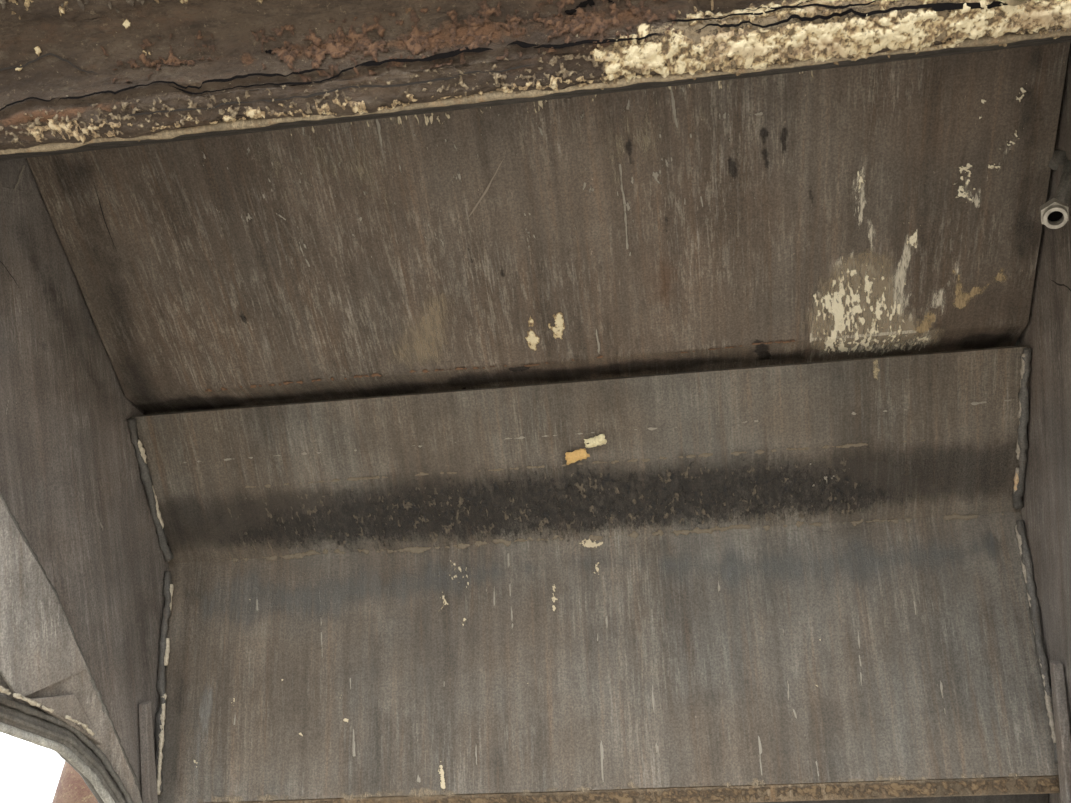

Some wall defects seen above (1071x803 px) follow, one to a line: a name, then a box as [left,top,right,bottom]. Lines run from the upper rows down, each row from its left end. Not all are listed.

peeling [0,0,33,19]
peeling [51,0,89,15]
corrosion [243,0,678,82]
crack [0,0,1008,116]
peeling [431,0,1071,100]
peeling [150,94,417,132]
peeling [907,222,921,248]
peeling [813,256,929,357]